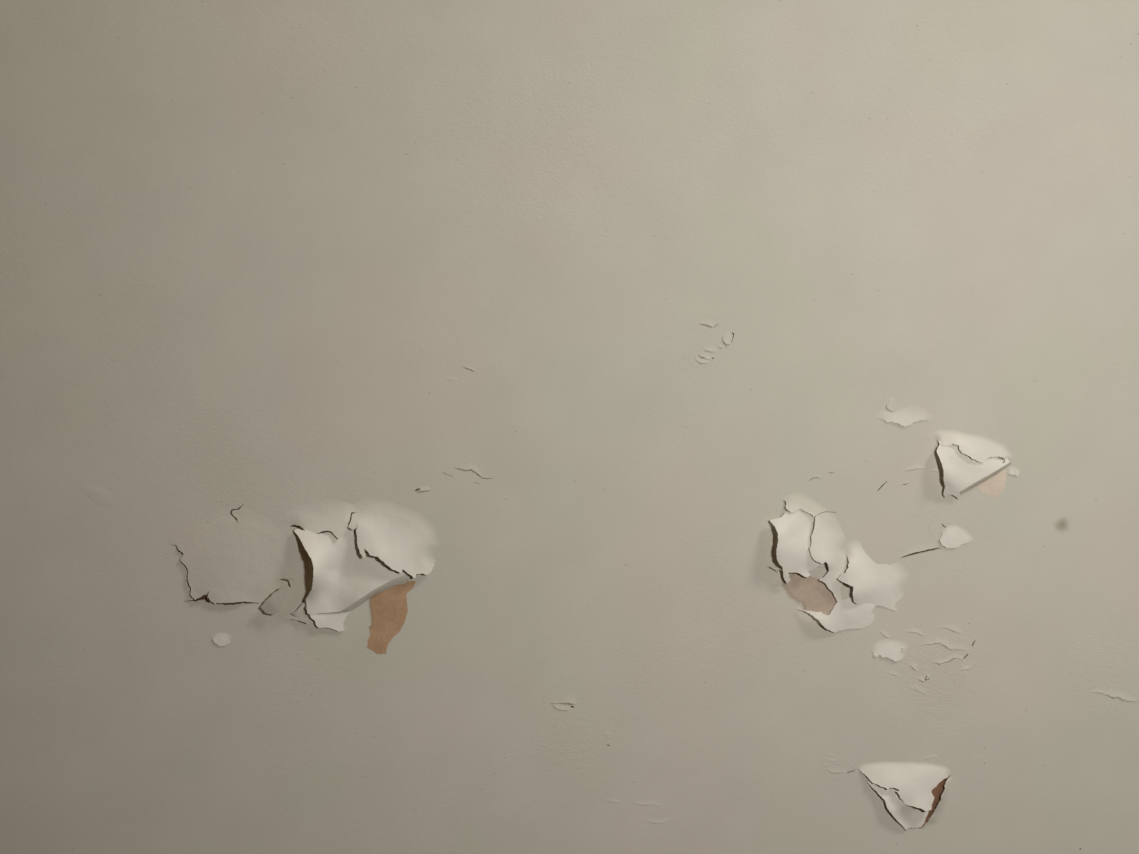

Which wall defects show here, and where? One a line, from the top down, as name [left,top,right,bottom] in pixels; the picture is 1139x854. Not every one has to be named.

peeling [874,397,1020,499]
peeling [166,498,441,654]
peeling [770,492,975,633]
peeling [871,639,909,662]
peeling [847,753,954,831]